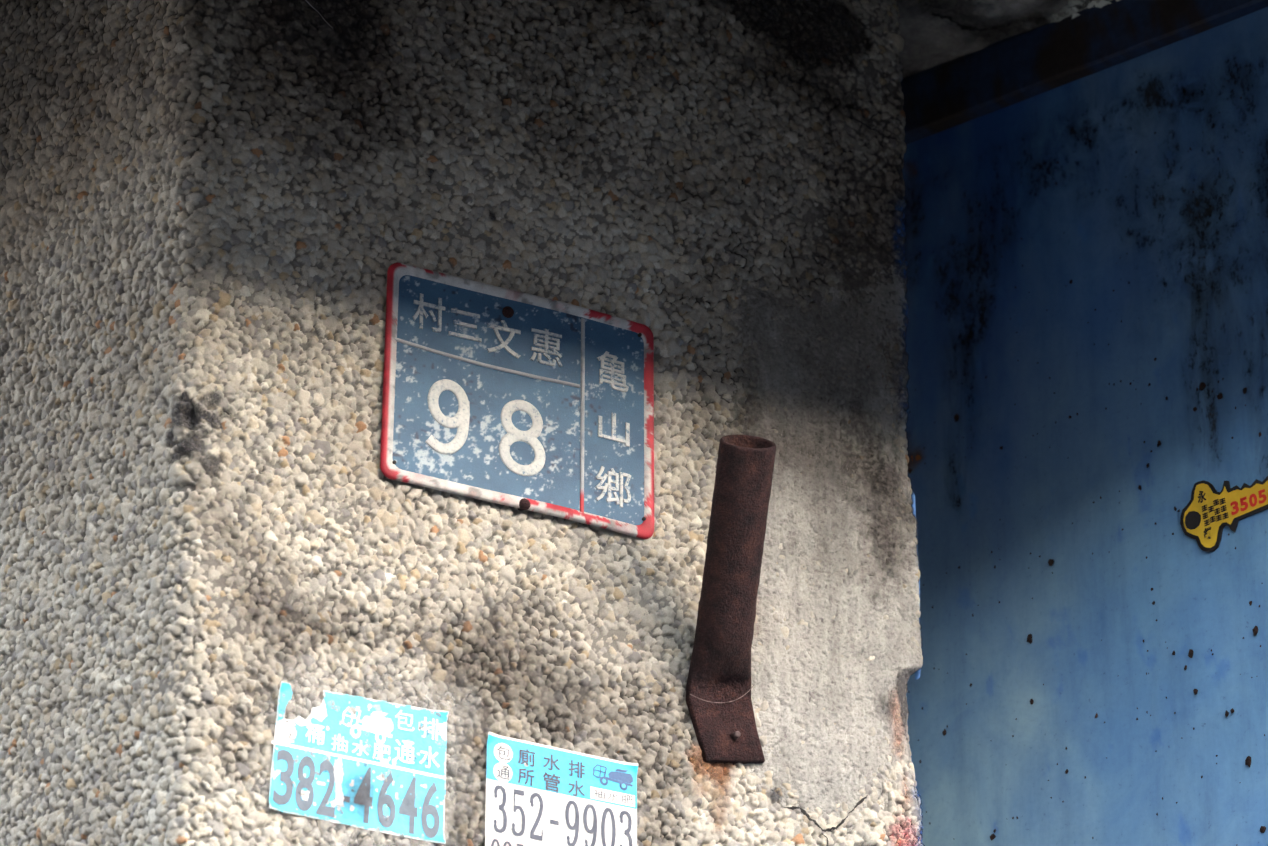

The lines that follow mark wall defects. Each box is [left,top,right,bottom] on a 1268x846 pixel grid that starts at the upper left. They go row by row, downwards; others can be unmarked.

damp [0,0,114,132]
damp [246,0,1048,233]
damp [1067,57,1268,458]
corrosion [907,452,923,469]
spalling [883,668,917,732]
crack [784,796,867,846]